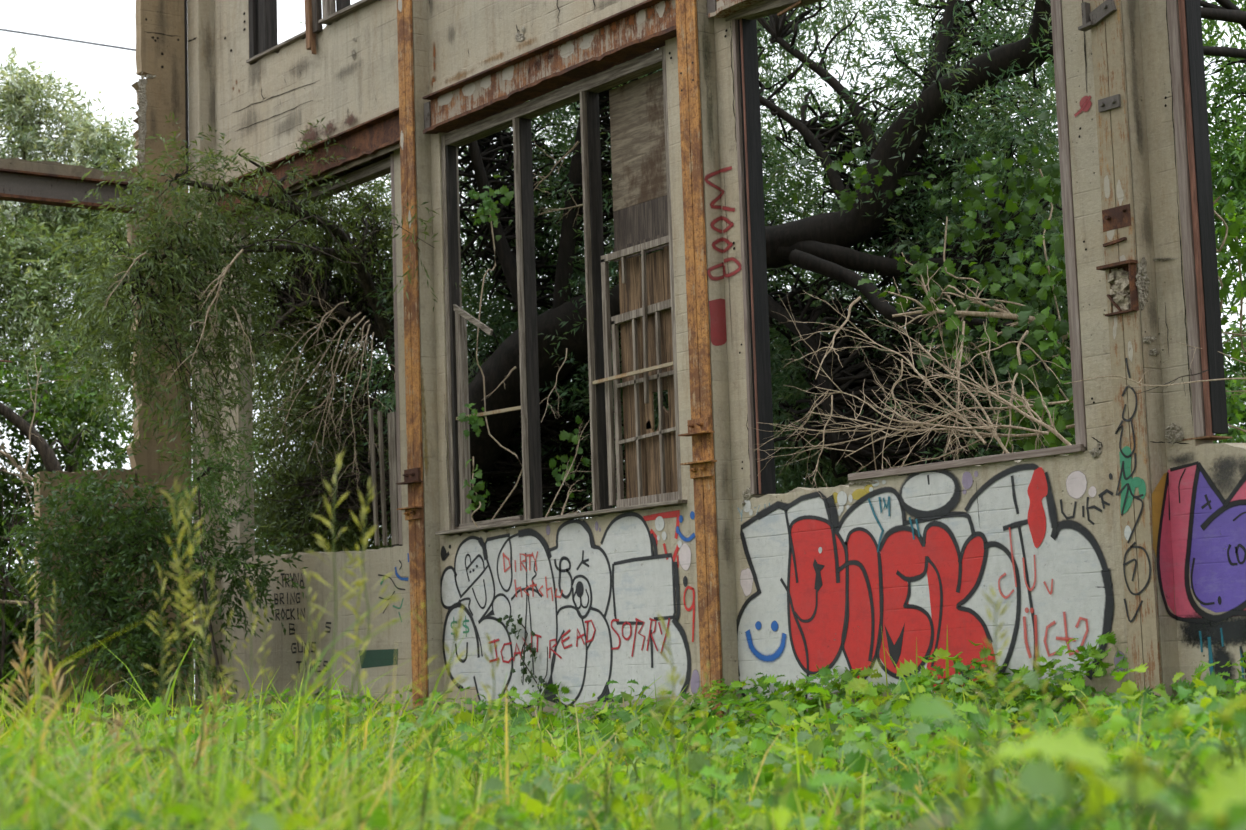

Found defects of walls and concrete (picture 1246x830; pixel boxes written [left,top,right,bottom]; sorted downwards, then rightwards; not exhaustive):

rust [599,0,671,37]
rust [298,114,356,146]
peeling [1104,175,1124,206]
spalling [1119,255,1177,310]